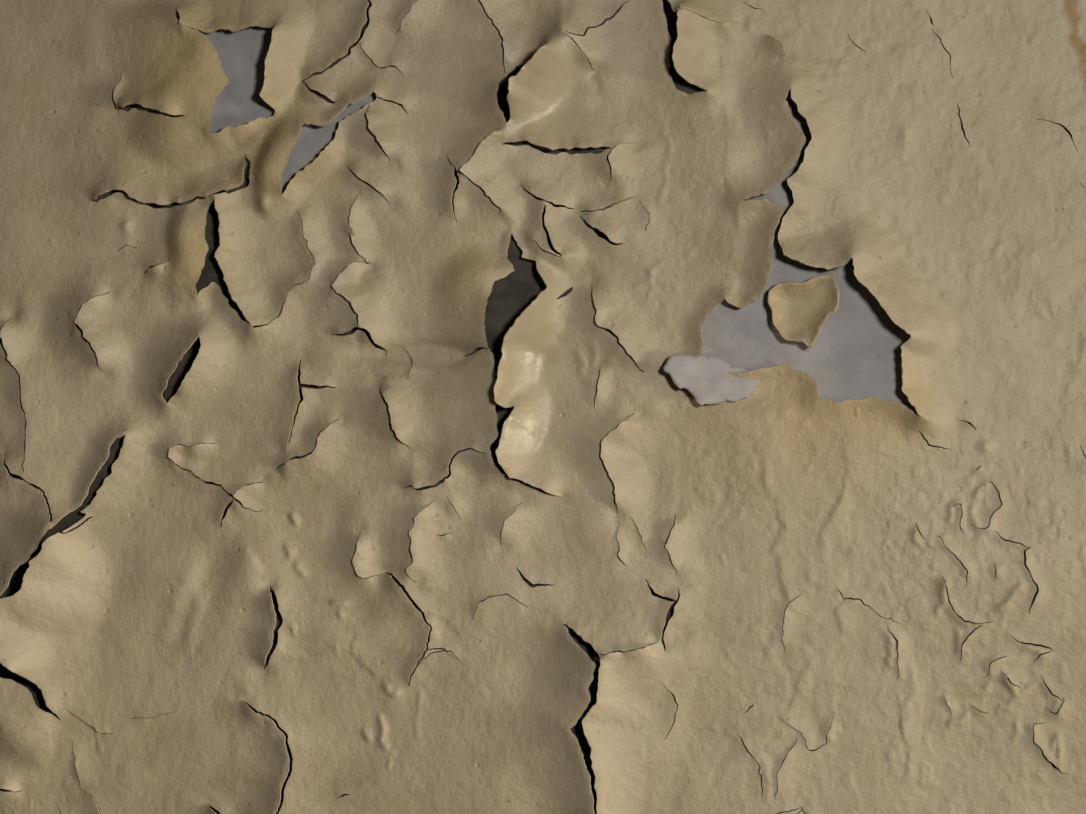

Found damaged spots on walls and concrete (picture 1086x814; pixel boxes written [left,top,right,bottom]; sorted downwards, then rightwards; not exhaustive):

peeling [0,0,620,809]
peeling [663,0,970,414]